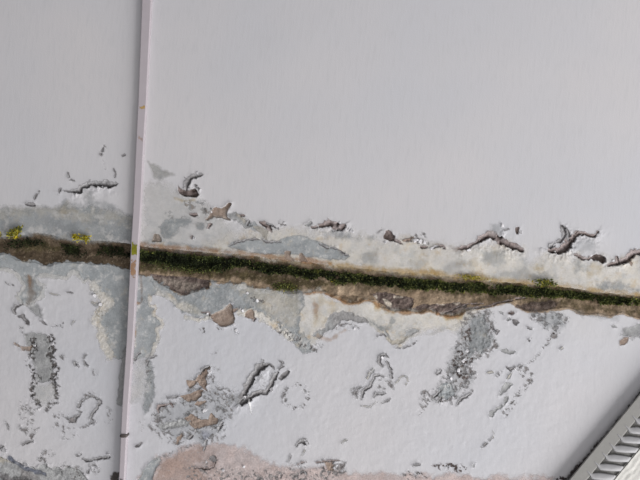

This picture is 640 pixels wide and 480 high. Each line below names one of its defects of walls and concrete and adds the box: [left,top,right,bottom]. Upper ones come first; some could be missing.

flaking render [178,171,203,197]
damp [0,204,133,242]
spalling [150,274,209,295]
damp [246,228,640,292]
flaking render [574,253,605,263]
peeling [12,303,113,446]
peeling [149,359,290,451]
flaking render [201,297,256,332]
damp [0,253,475,413]
peeling [351,353,409,408]
peeling [372,292,568,417]
flaking render [0,445,87,480]